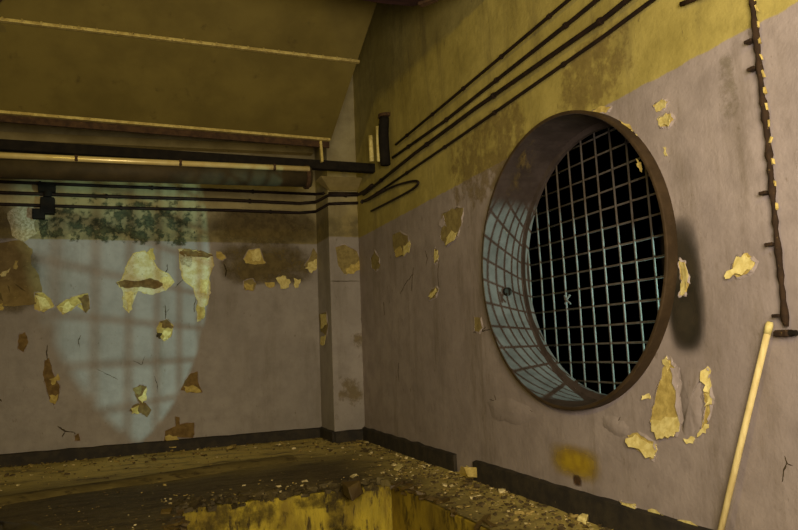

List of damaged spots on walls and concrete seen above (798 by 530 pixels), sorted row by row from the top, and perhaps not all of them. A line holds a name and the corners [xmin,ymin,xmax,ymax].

damp [38,193,195,245]
peeling [433,206,464,265]
peeling [0,206,91,315]
peeling [116,248,226,322]
peeling [243,248,266,265]
peeling [243,275,301,291]
peeling [304,248,318,274]
peeling [678,257,690,298]
peeling [724,251,759,280]
peeling [128,384,151,417]
peeling [625,355,715,462]